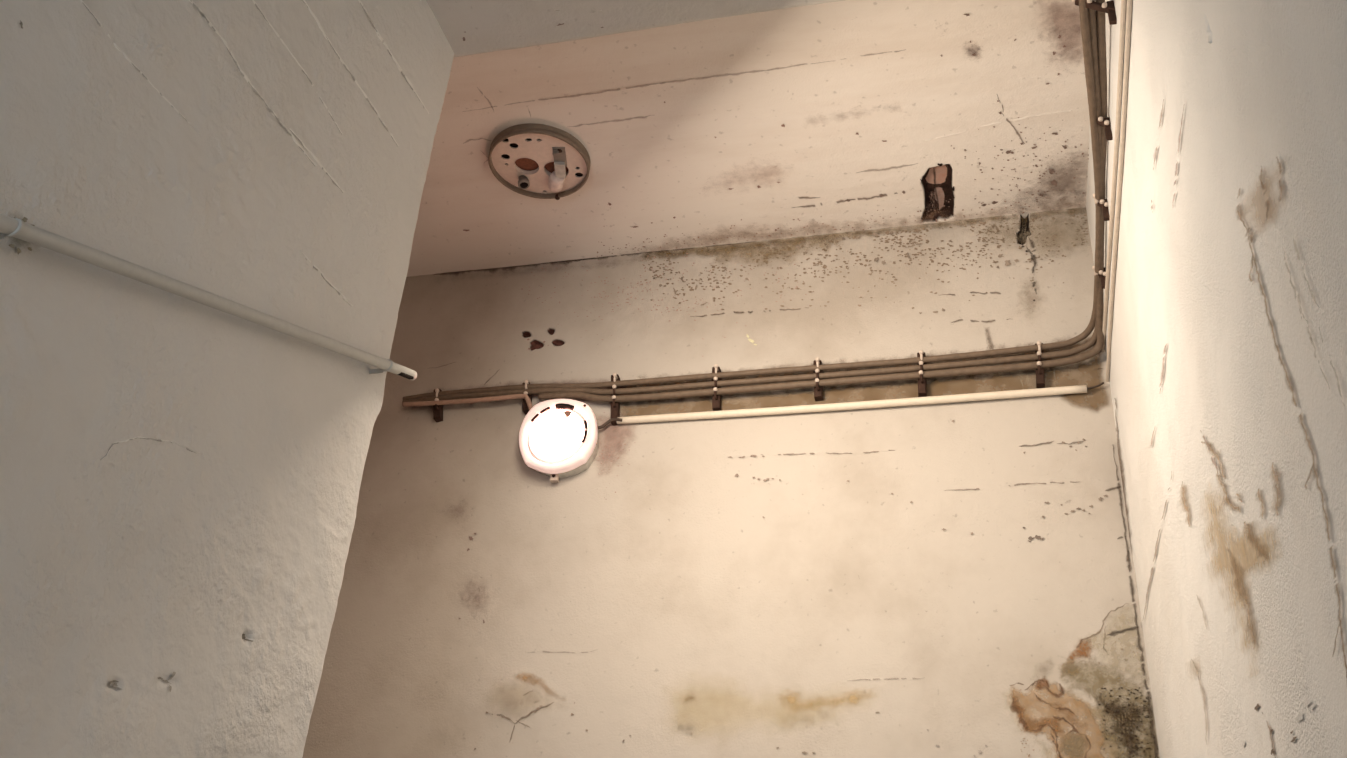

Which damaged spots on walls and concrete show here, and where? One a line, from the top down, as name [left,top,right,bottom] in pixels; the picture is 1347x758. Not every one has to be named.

water stain [951,117,1089,211]
peeling [522,163,1088,340]
water stain [1071,664,1159,758]